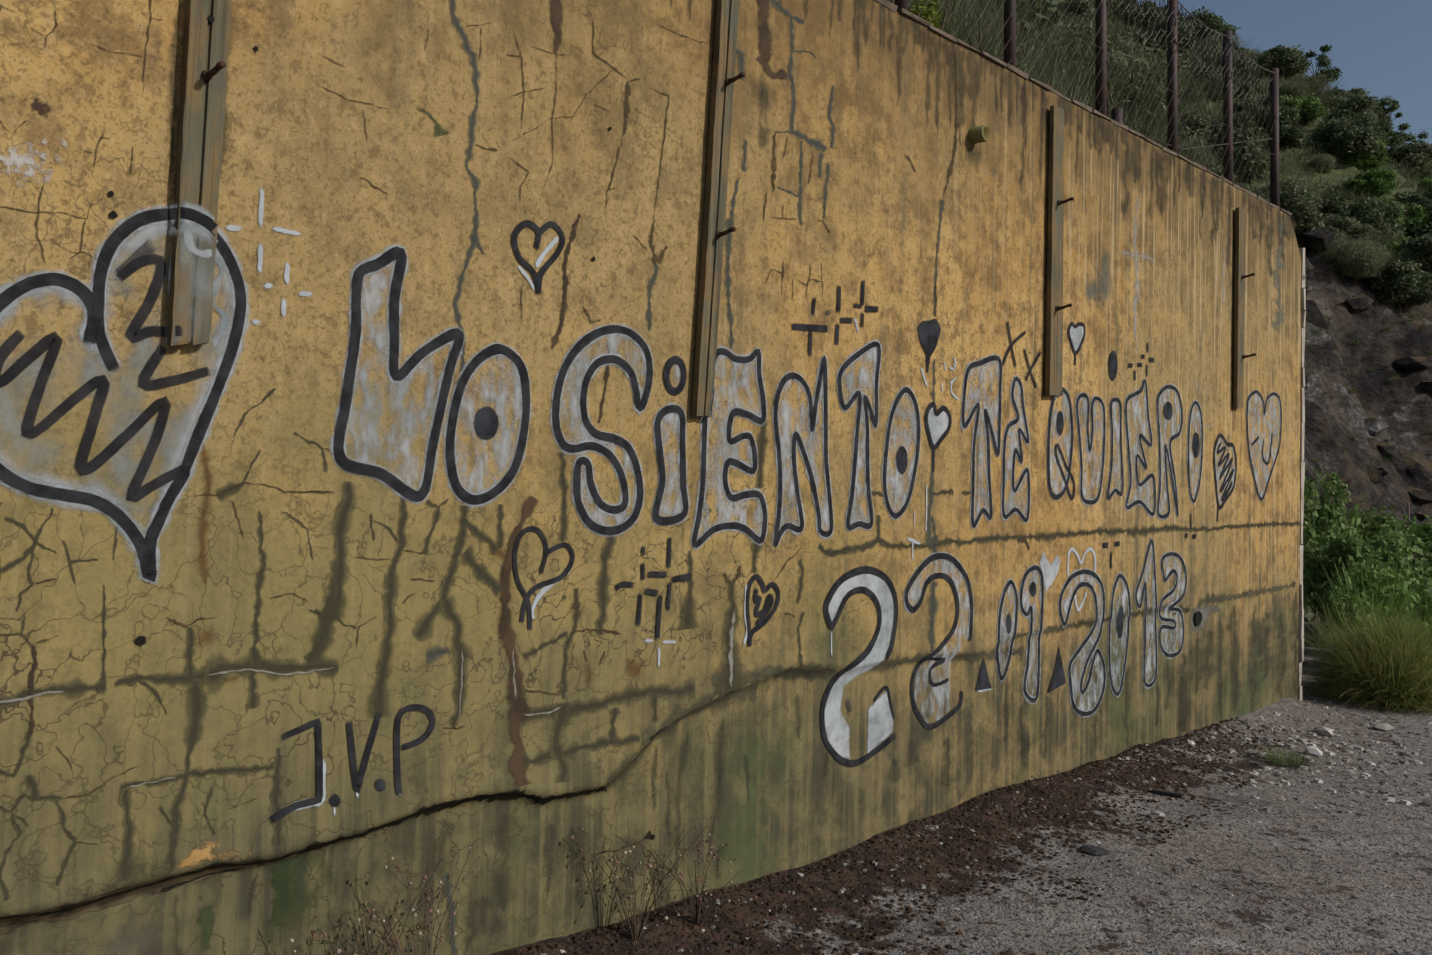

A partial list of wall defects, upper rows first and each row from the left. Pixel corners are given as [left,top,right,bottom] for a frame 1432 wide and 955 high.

peeling [0,139,67,194]
crack [322,56,387,140]
crack [425,0,670,423]
crack [725,0,836,349]
crack [905,26,958,316]
leakage [830,0,1291,339]
crack [929,359,937,403]
crack [0,388,1300,935]
leakage [1157,596,1298,733]
leakage [198,905,214,951]
leakage [439,821,506,955]